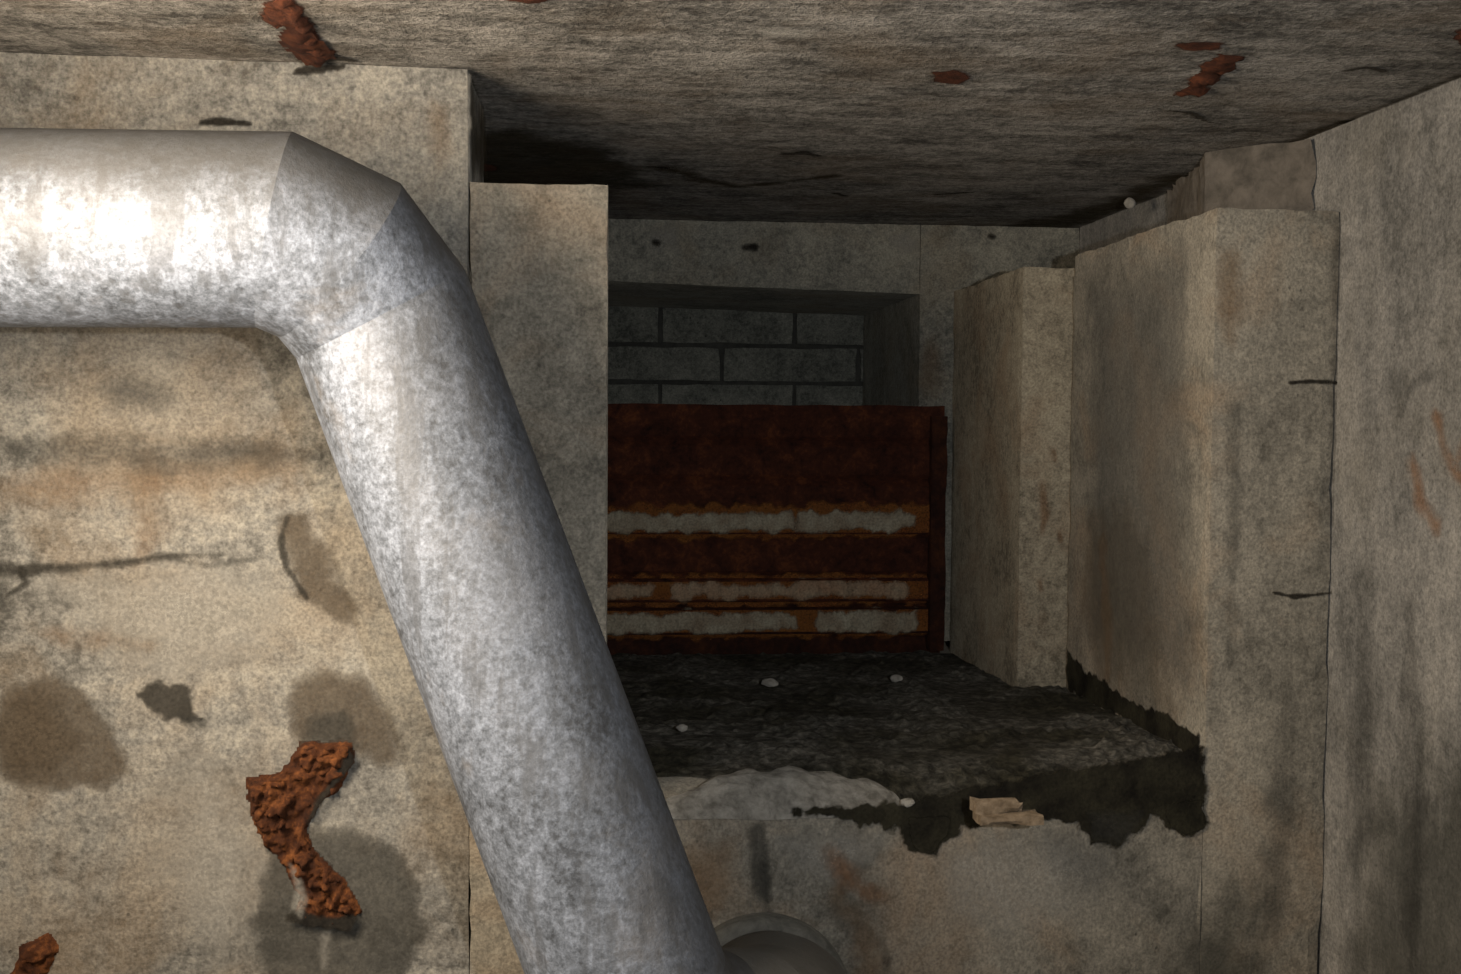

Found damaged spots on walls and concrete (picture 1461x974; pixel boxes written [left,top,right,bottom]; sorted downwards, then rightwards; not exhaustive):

corrosion [932,70,969,84]
corrosion [607,501,930,543]
crack [0,554,178,594]
corrosion [607,572,928,641]
damp [138,681,202,722]
damp [0,681,122,788]
damp [259,834,421,974]